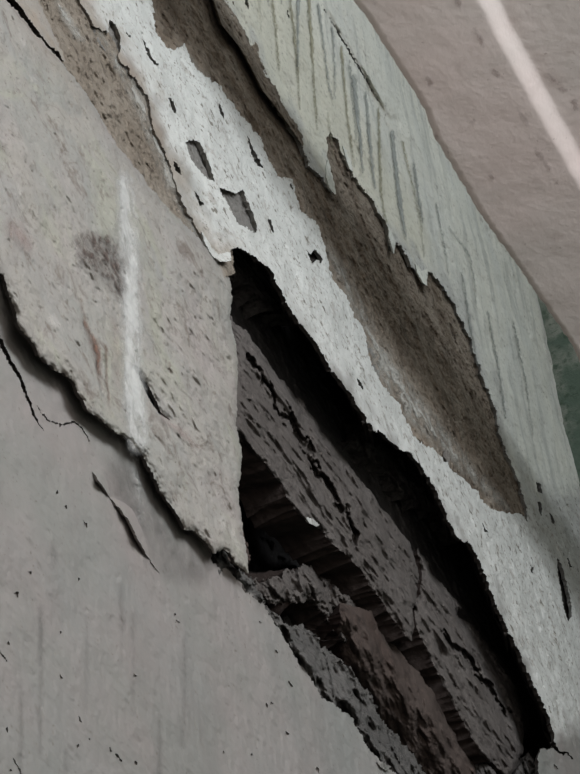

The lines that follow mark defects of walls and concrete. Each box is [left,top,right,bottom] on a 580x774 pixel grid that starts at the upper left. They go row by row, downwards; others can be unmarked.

peeling [38,0,198,237]
damp [290,0,387,221]
peeling [152,0,525,517]
damp [390,131,423,234]
peeling [92,468,160,574]
spalling [201,231,558,774]